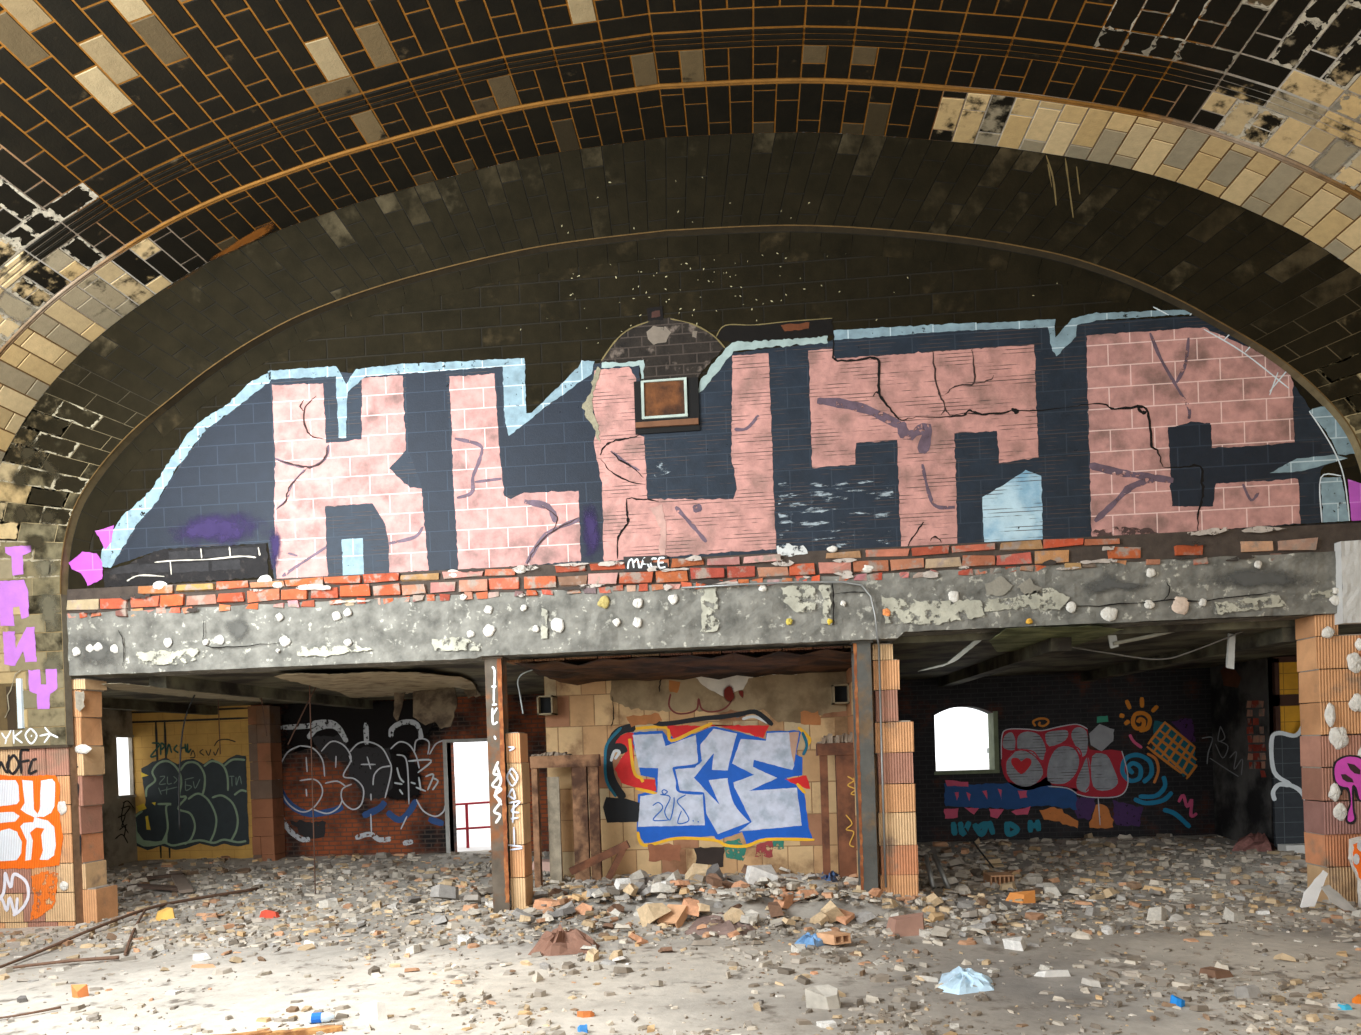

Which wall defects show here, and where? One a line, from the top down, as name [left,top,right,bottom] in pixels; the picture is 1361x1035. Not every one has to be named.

leakage [1318,353,1361,445]
crack [817,333,1205,546]
leakage [0,400,103,579]
crack [1242,484,1259,501]
flaking render [66,480,1361,639]
leakage [43,656,61,673]
flaking render [136,648,204,665]
flaking render [297,645,373,657]
flaking render [432,637,480,651]
flaking render [989,625,1124,652]
flaking render [274,671,481,729]